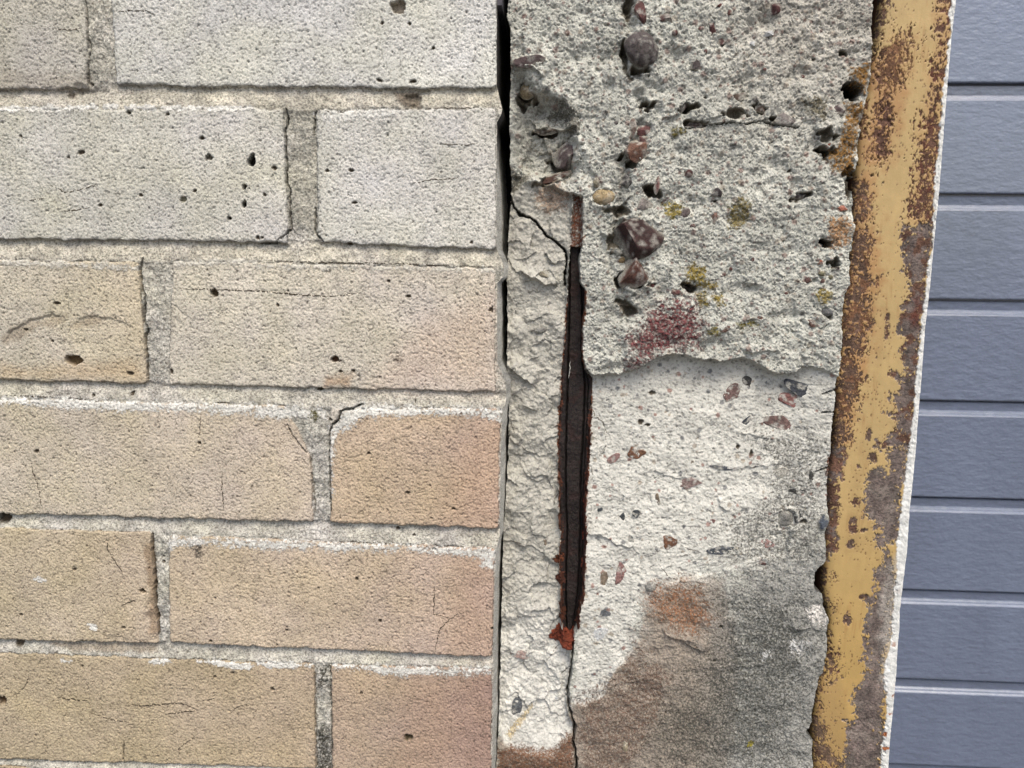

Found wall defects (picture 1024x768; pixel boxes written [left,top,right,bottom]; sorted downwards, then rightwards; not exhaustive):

corrosion [822,62,871,177]
crack [511,195,568,286]
corrosion [533,183,585,248]
corrosion [824,214,854,249]
spalling [498,0,952,768]
corrosion [548,304,593,650]
damp [497,417,829,768]
crack [545,644,578,768]